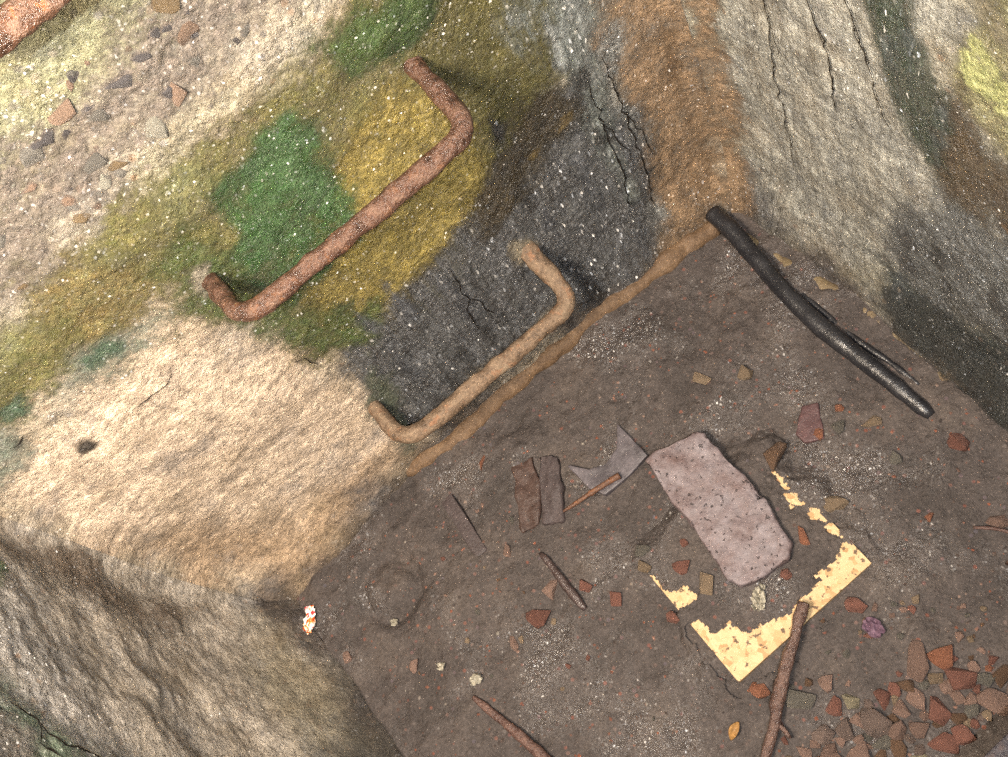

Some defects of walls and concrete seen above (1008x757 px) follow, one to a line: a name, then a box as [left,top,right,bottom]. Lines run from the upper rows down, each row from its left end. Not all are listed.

leakage [879,0,1008,430]
leakage [0,536,181,633]
crack [0,698,100,757]